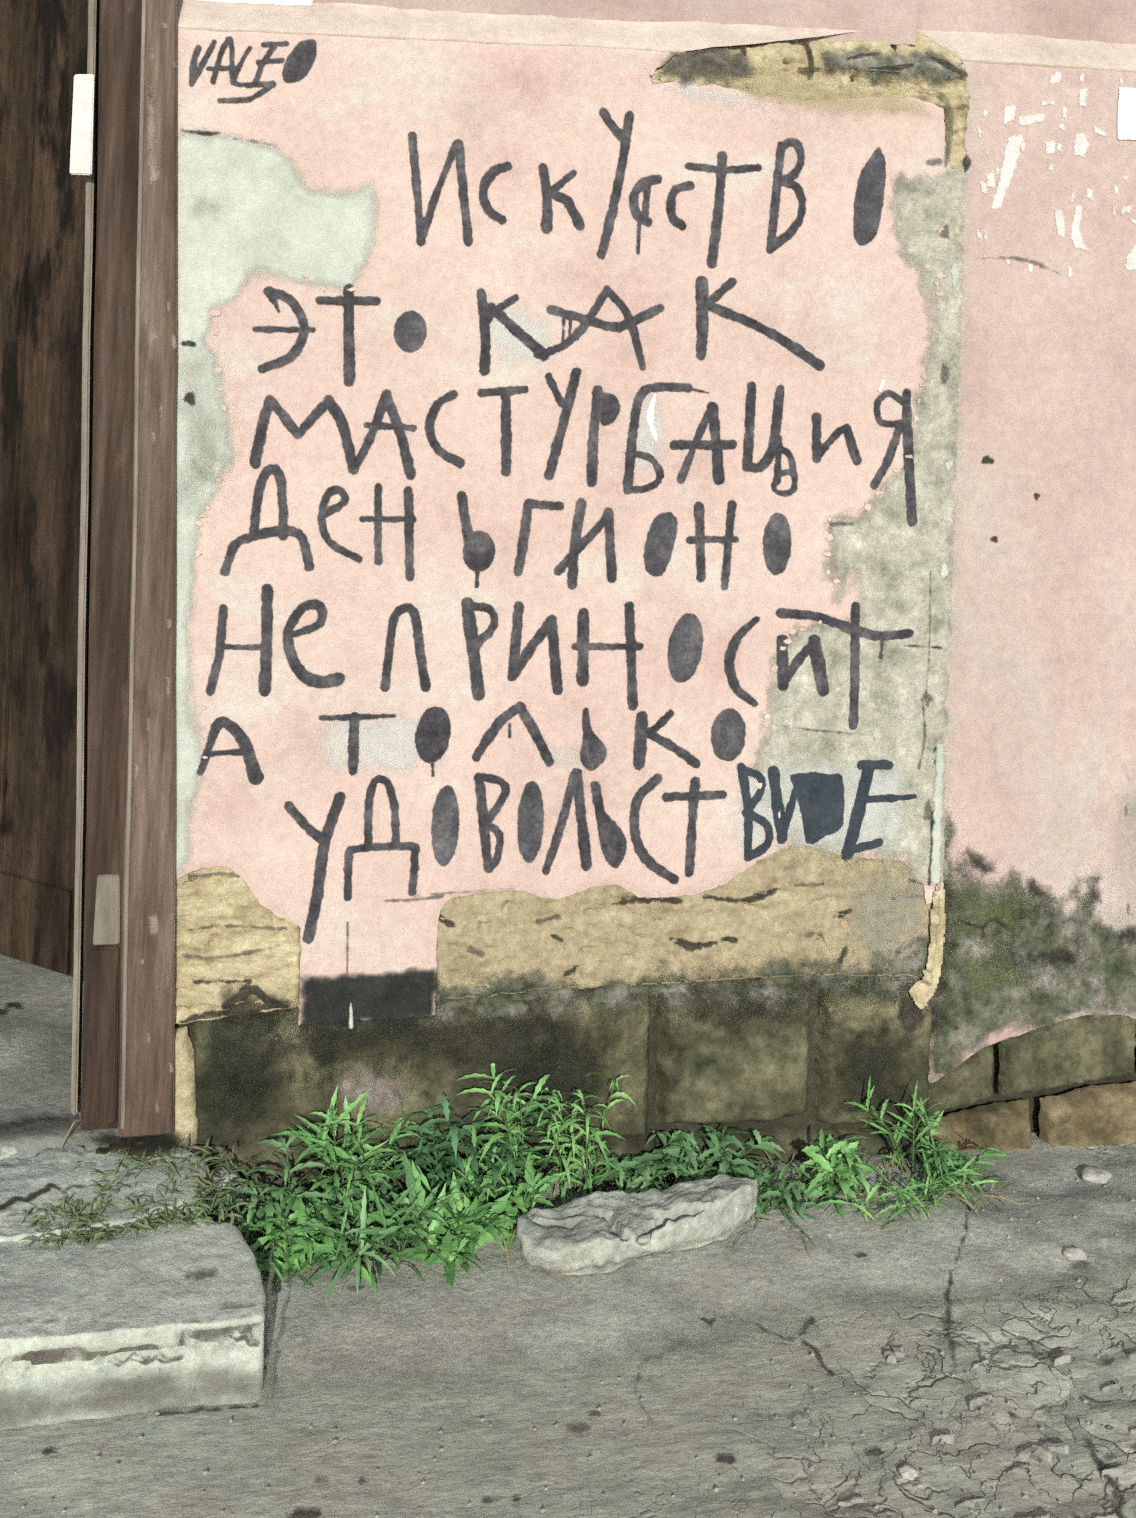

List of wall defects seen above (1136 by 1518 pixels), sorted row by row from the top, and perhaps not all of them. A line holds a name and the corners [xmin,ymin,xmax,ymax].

peeling [147,93,158,182]
peeling [1113,176,1136,224]
peeling [1125,245,1136,270]
spalling [435,31,1106,1022]
peeling [150,130,377,1025]
leakage [943,828,951,913]
crack [758,1318,849,1377]
crack [942,1207,1136,1441]
crack [1087,1439,1136,1518]